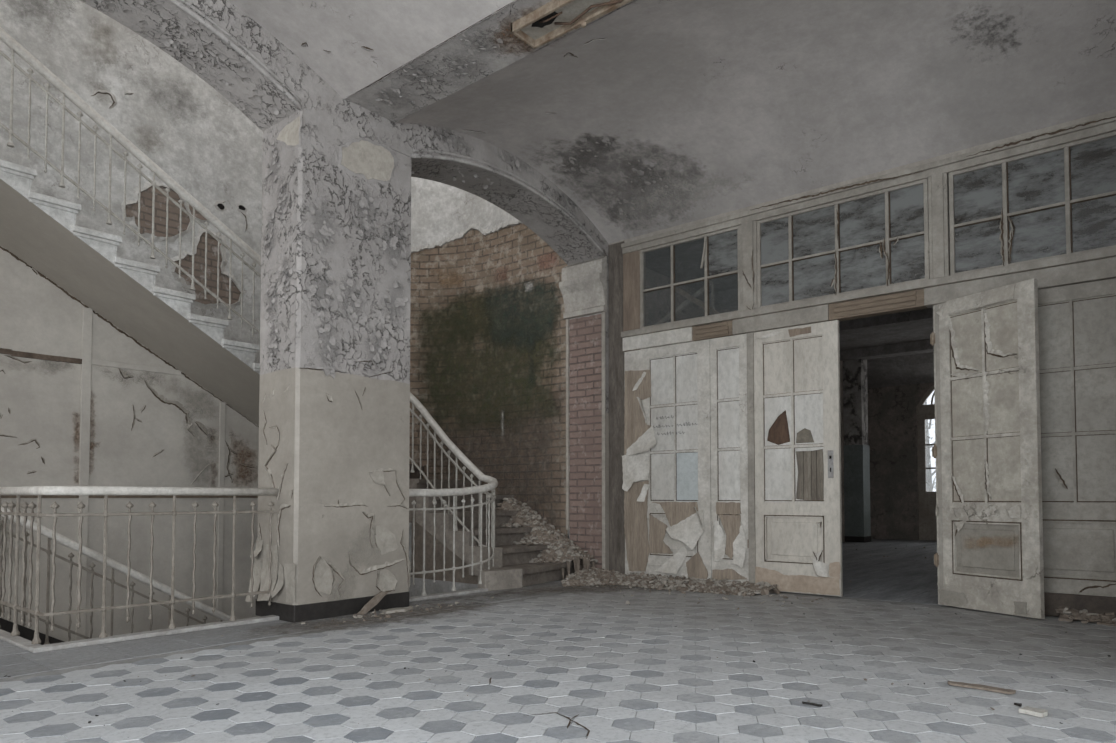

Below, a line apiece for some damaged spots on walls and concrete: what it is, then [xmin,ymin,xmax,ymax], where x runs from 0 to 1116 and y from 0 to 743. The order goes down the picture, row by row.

peeling [106,0,303,183]
spalling [121,179,248,310]
peeling [307,203,391,379]
damp [561,138,723,229]
crack [0,245,293,547]
peeling [622,370,841,595]